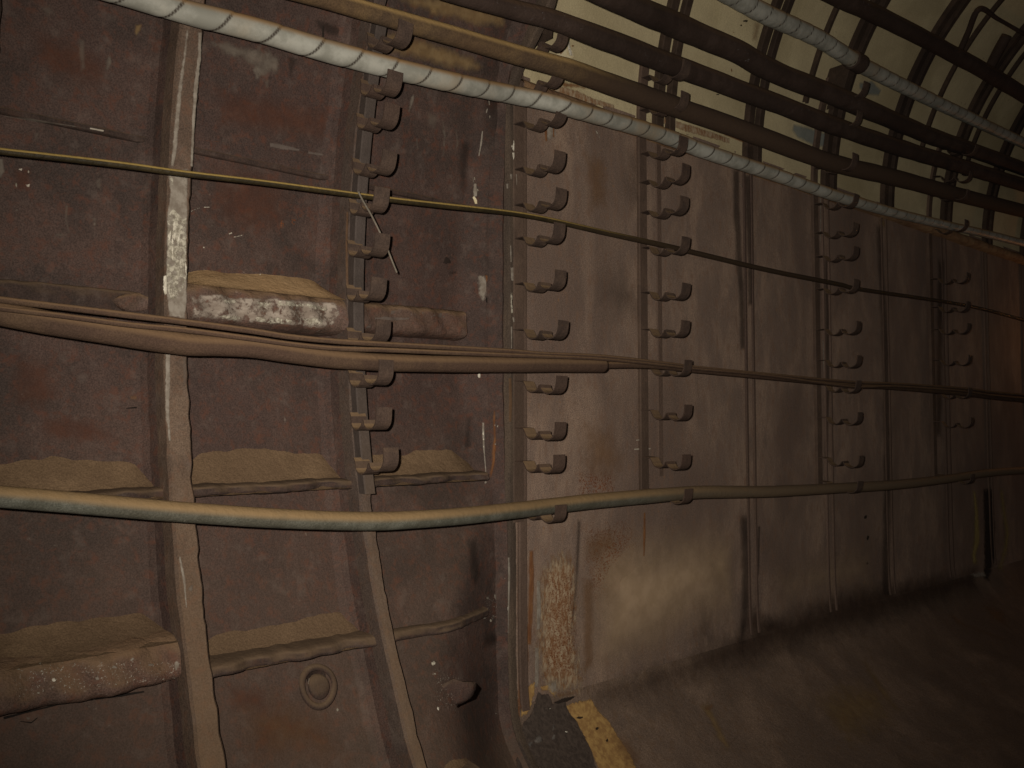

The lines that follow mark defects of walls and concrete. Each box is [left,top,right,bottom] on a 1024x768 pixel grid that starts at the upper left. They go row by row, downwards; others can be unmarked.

water stain [163,32,339,328]